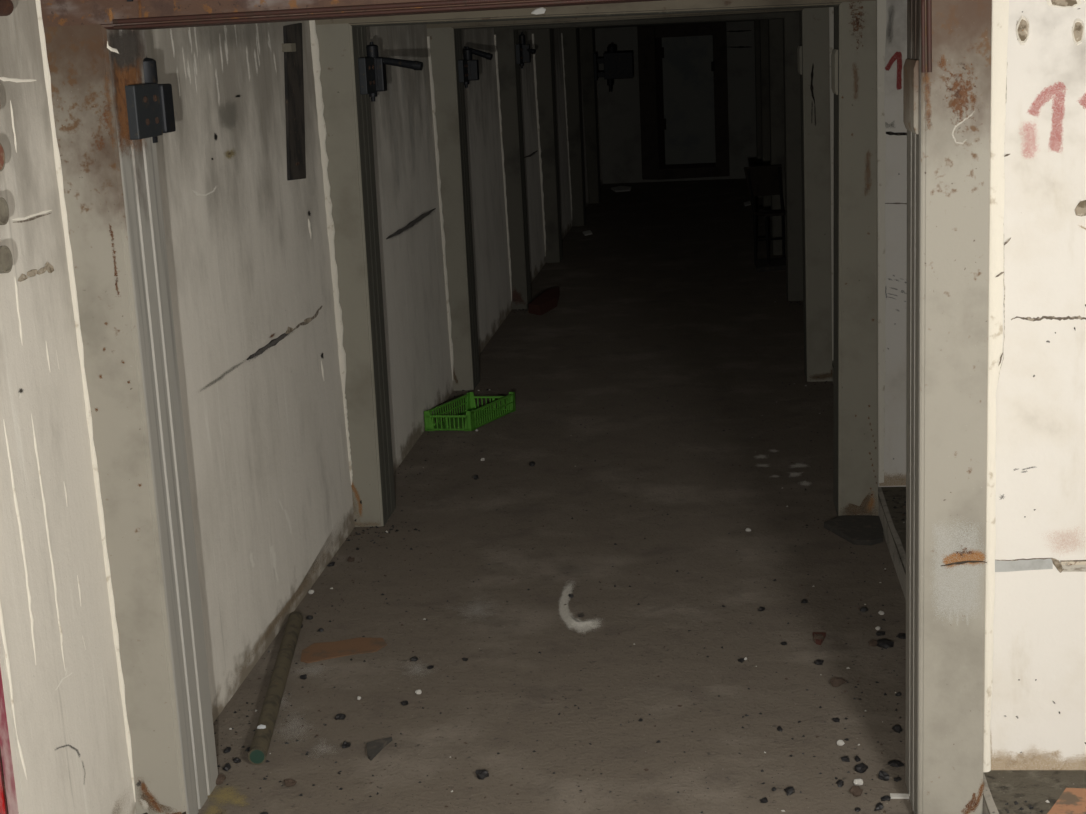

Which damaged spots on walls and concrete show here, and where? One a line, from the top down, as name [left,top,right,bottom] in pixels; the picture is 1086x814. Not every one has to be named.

corrosion [93,0,148,161]
corrosion [923,55,978,134]
corrosion [109,226,120,295]
crack [386,208,436,239]
crack [199,306,322,392]
crack [996,272,1086,380]
water stain [990,731,1086,770]